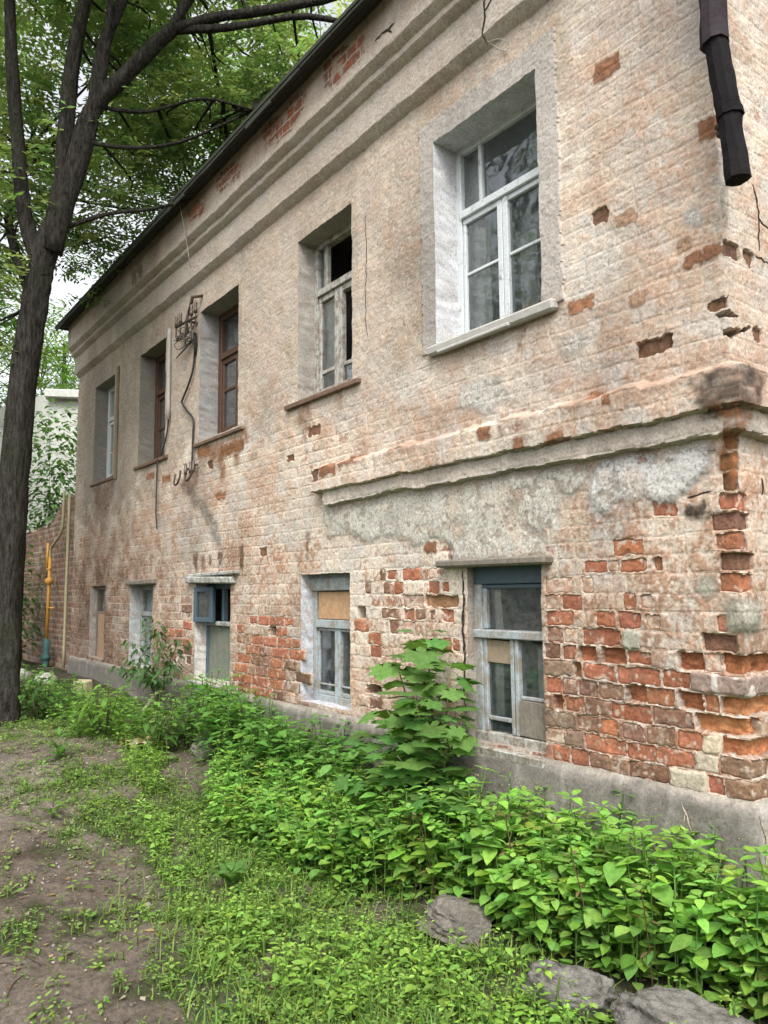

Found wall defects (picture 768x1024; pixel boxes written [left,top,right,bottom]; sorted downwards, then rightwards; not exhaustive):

spalling [593,50,621,84]
crack [362,216,370,335]
spalling [677,208,751,270]
spalling [708,299,725,312]
crack [752,184,768,263]
spalling [639,334,673,358]
water stain [697,365,763,415]
flaking render [233,615,314,704]
flaking render [358,685,383,709]
flaking render [354,567,460,657]
crack [459,571,467,714]
flaking render [544,539,768,802]